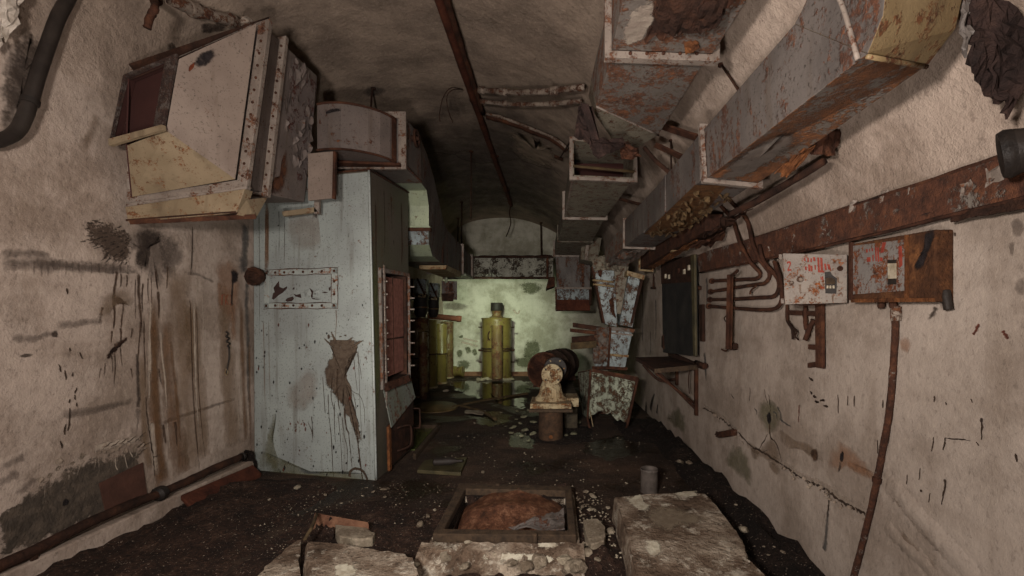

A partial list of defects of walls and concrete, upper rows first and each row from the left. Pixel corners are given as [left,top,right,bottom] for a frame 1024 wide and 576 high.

water stain [81,219,168,407]
water stain [190,279,205,453]
water stain [231,225,251,430]
crack [744,389,783,465]